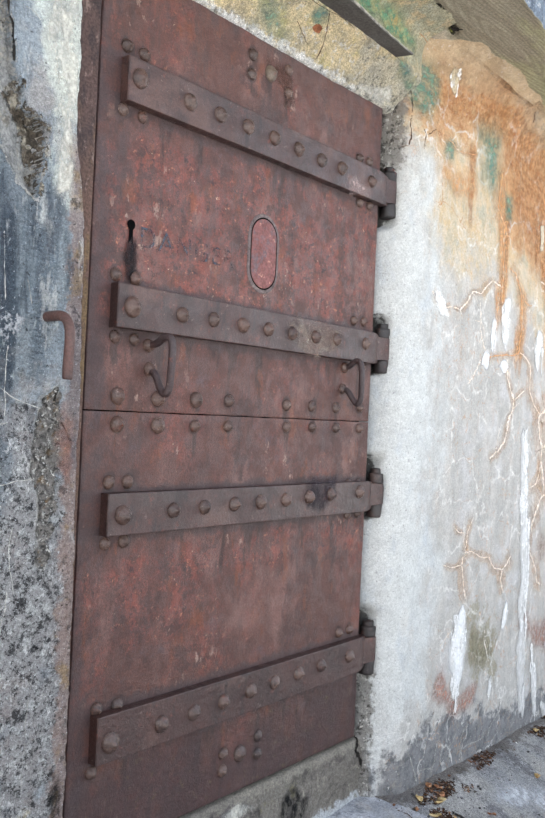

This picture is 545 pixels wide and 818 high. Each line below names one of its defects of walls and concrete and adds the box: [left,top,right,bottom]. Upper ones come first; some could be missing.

damp [356,0,415,46]
spalling [0,0,52,202]
damp [358,85,391,101]
damp [400,61,439,112]
damp [450,69,462,97]
corrosion [480,92,545,316]
crack [432,165,545,604]
crack [0,526,14,632]
damp [450,606,468,714]